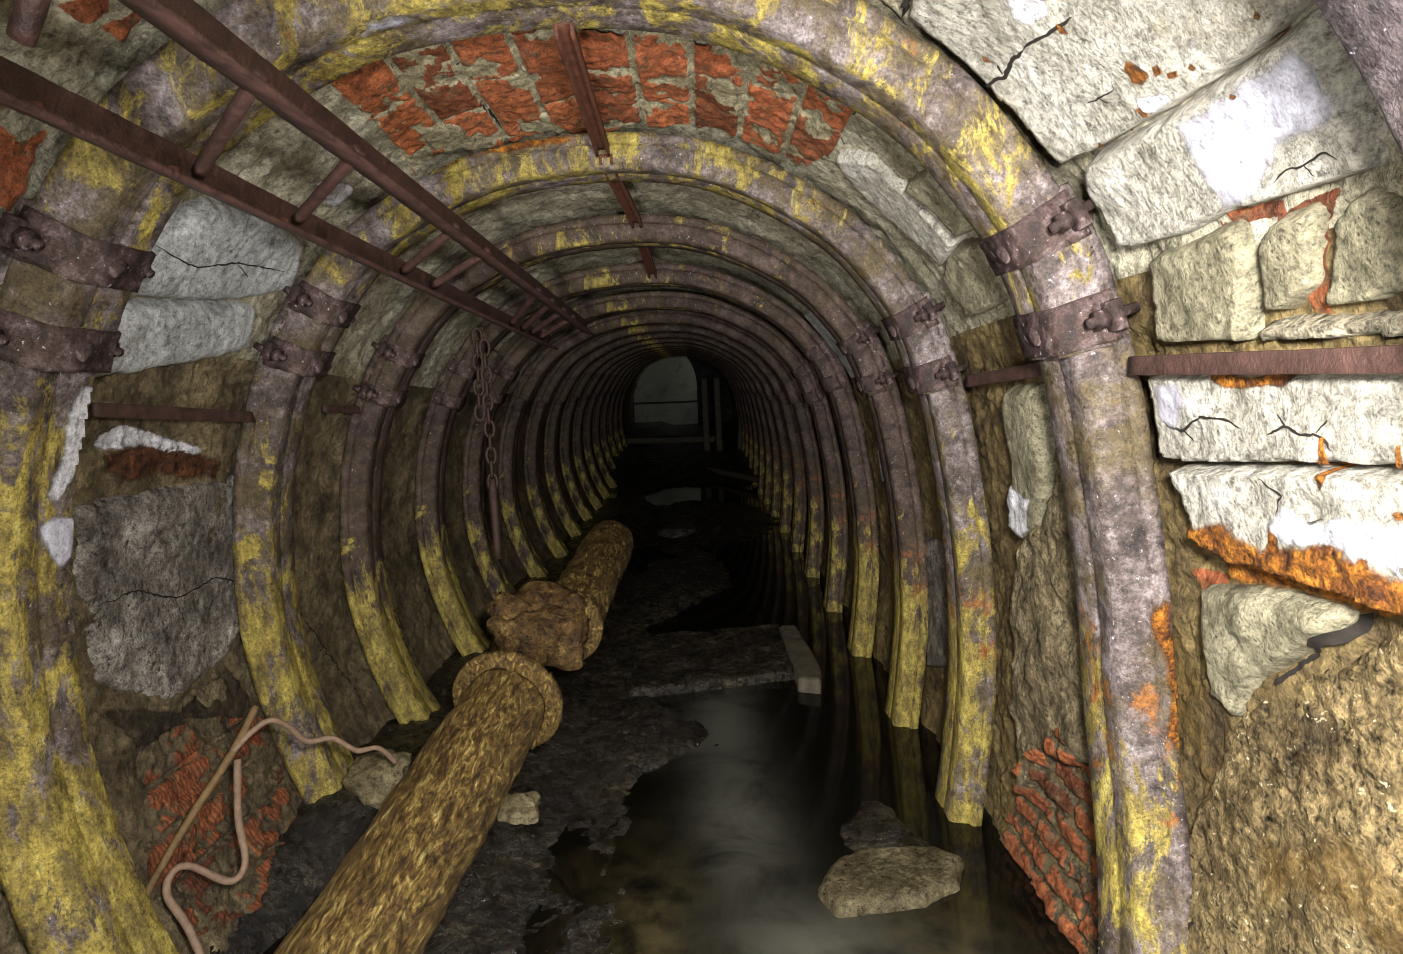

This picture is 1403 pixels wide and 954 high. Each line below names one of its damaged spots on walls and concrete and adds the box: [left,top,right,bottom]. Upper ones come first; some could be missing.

flaking render [330,29,587,175]
flaking render [576,29,857,167]
crack [985,17,1072,88]
efflorescence [1181,56,1329,202]
crack [1272,152,1337,185]
crack [1163,414,1331,451]
efflorescence [1338,482,1369,502]
corrosion [1187,524,1403,617]
efflorescence [1270,509,1403,581]
corrosion [1151,602,1179,746]
flaking render [999,726,1099,954]